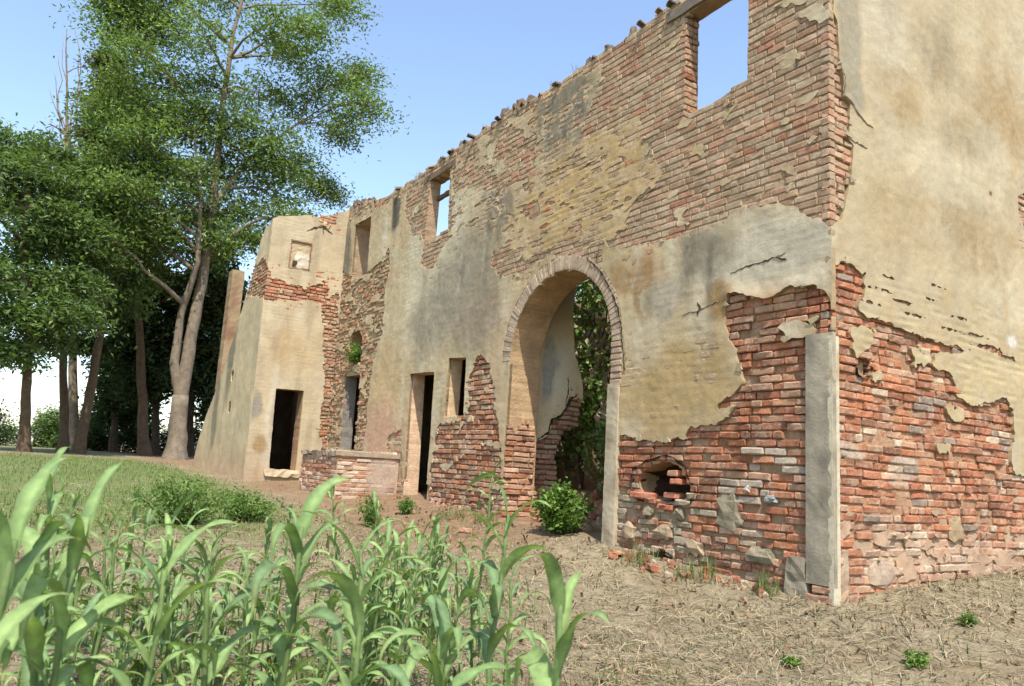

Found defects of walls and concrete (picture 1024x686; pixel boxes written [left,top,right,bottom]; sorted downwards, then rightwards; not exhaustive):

flaking render [312,0,856,287]
flaking render [246,244,394,450]
flaking render [427,354,581,518]
crack [682,301,719,316]
crack [730,252,787,273]
flaking render [610,257,1024,602]